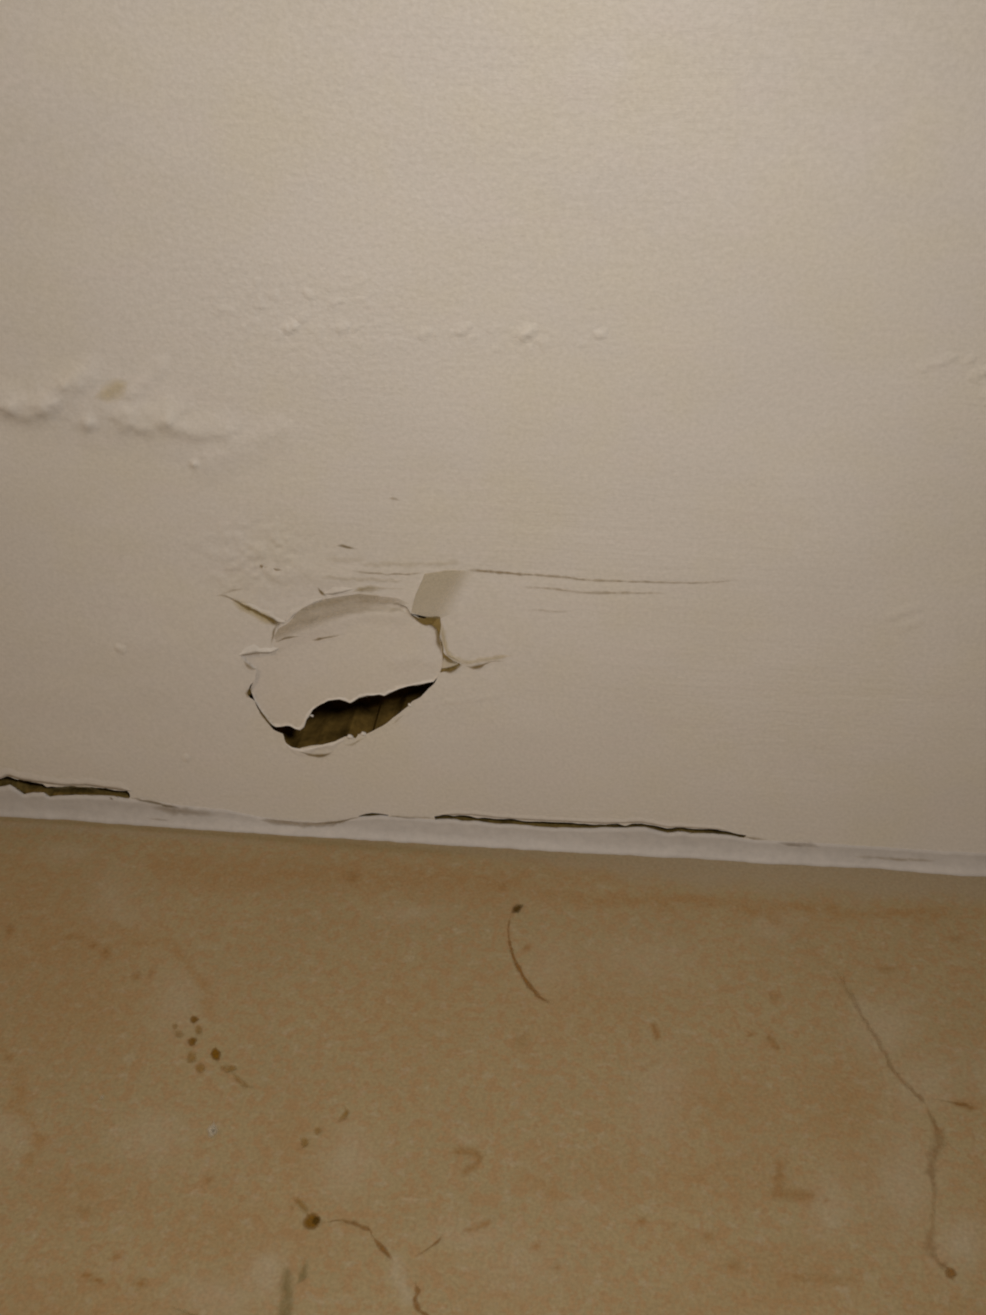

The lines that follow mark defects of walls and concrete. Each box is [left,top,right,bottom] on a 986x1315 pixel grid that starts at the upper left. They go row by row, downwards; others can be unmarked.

spalling [235,570,485,757]
crack [0,768,172,807]
crack [328,813,399,823]
crack [434,810,746,837]